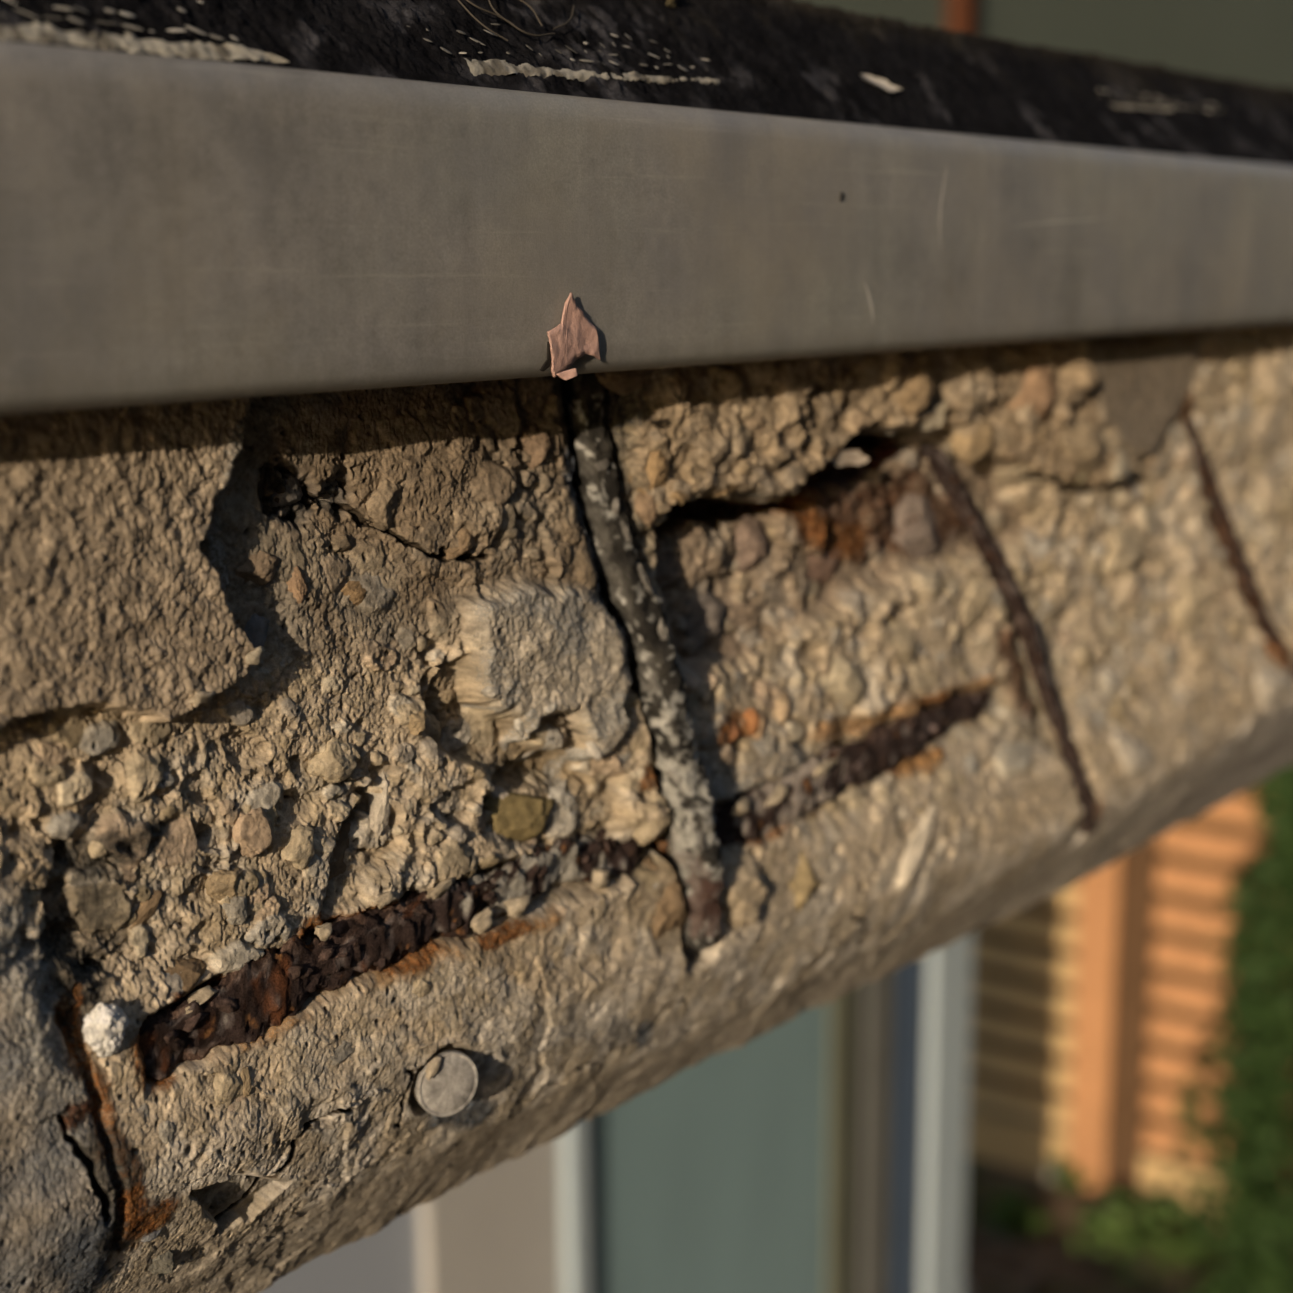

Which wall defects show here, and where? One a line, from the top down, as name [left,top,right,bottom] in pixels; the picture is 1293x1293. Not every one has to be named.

crack [285,470,489,563]
corrosion [815,628,1033,739]
spalling [0,323,1293,1176]
corrosion [649,834,671,864]
corrosion [173,976,221,1001]
corrosion [293,901,399,941]
corrosion [378,938,458,979]
corrosion [52,985,178,1243]
crack [395,1043,449,1128]
crack [508,970,712,1110]
crack [213,1107,355,1236]
spalling [147,1249,175,1275]